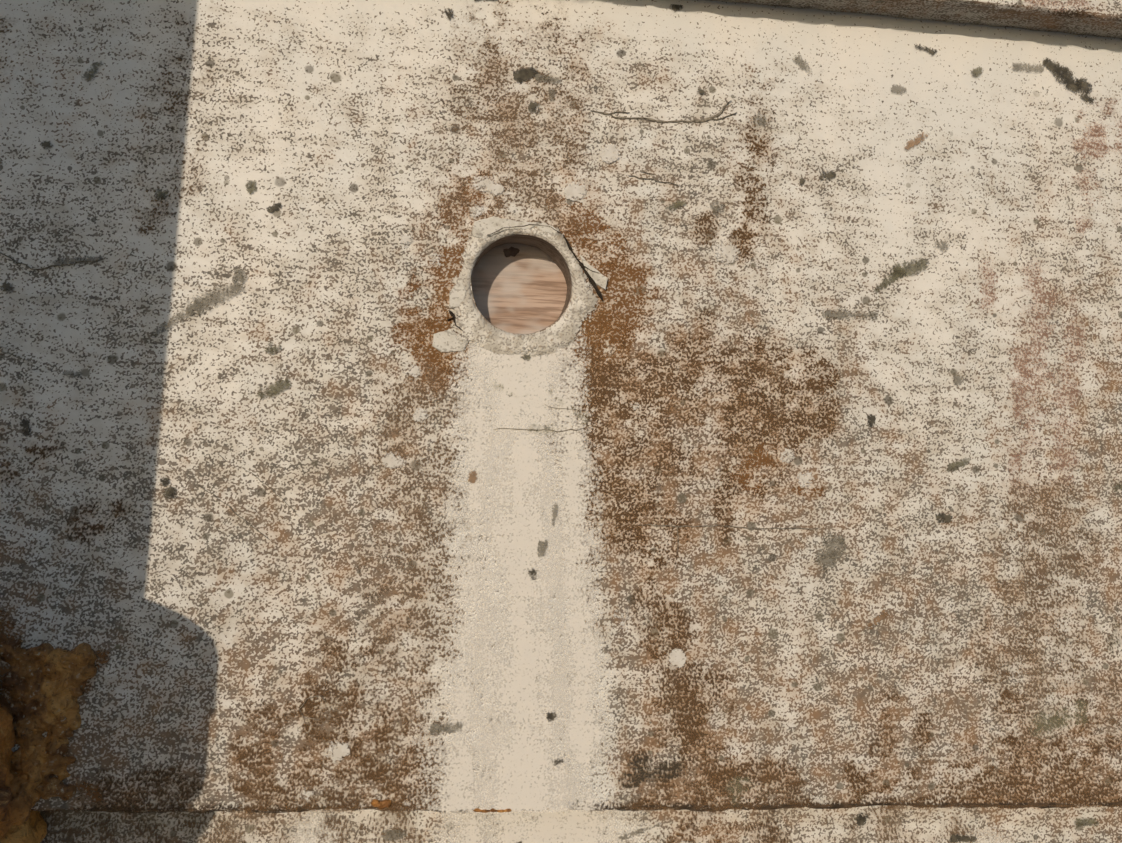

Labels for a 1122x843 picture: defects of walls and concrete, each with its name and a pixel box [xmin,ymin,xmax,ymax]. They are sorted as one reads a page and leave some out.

crack [487,224,603,301]
water stain [414,330,653,843]
water stain [1034,701,1086,735]
water stain [619,753,682,788]